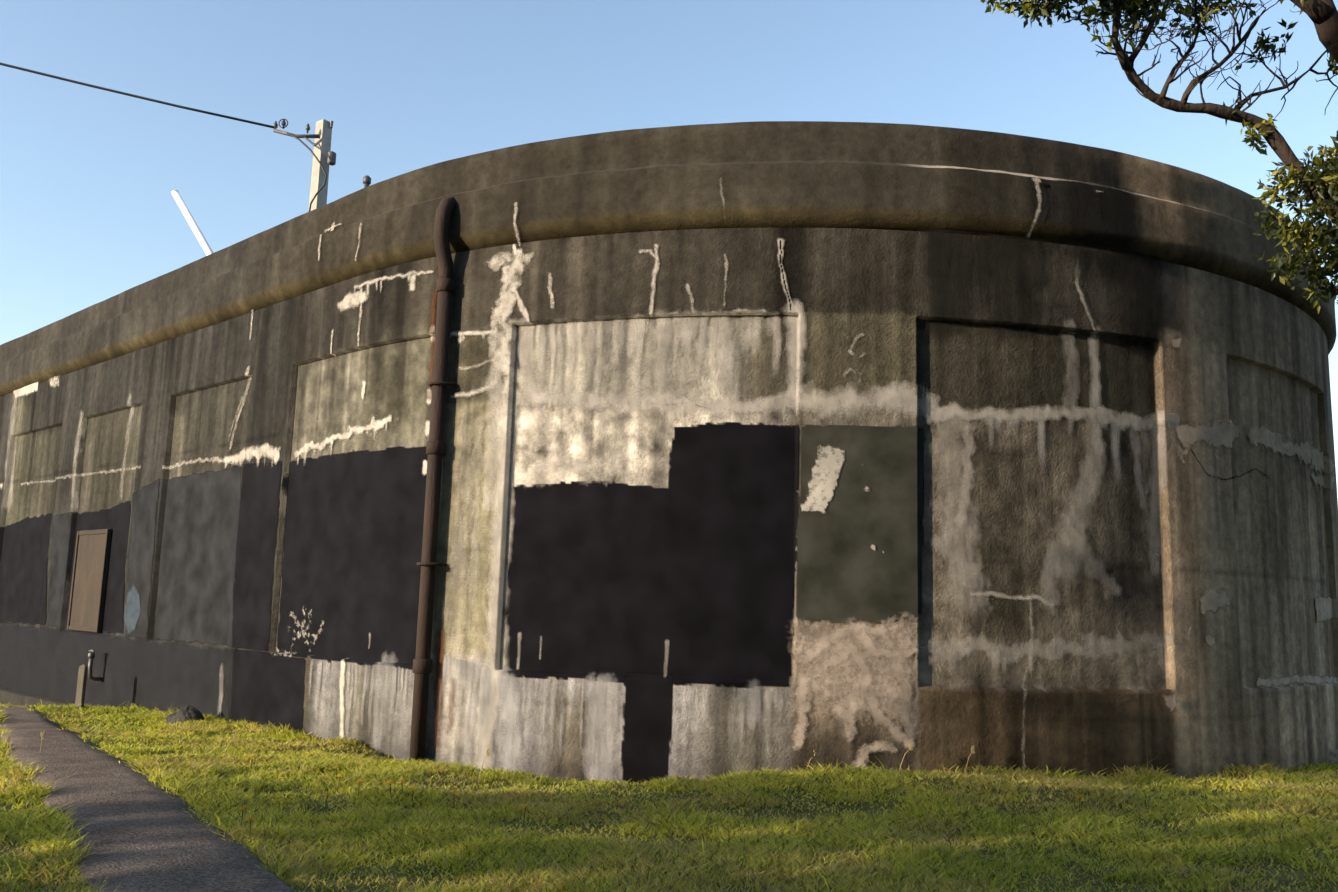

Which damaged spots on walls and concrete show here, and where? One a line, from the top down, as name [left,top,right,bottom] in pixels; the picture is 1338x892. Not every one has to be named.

damp [338,271,432,309]
damp [622,303,1179,465]
damp [214,444,279,464]
damp [295,416,391,459]
damp [429,245,620,773]
damp [964,583,1054,606]